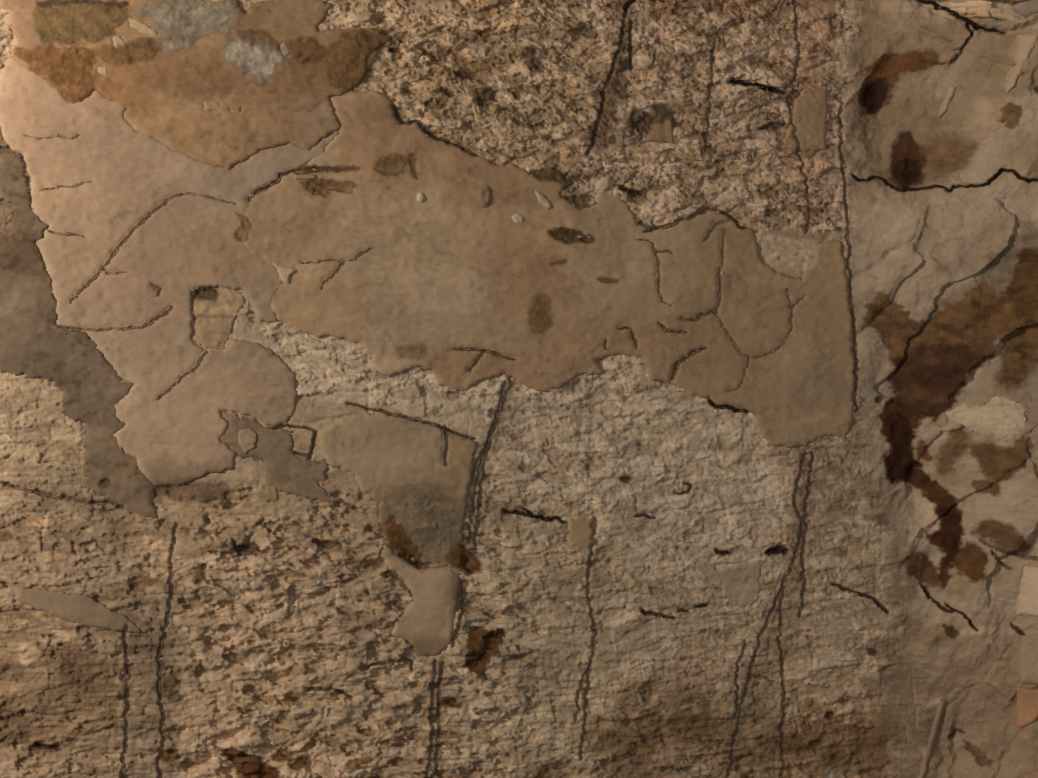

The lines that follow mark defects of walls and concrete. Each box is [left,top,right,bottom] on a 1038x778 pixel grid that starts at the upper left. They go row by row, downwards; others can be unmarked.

peeling [113,35,126,48]
peeling [129,16,158,36]
crack [917,0,1004,65]
crack [585,0,634,155]
corrosion [859,49,937,115]
corrosion [889,132,927,189]
crack [838,97,1038,411]
spalling [192,287,246,350]
peeling [238,428,257,453]
corrosion [880,394,988,588]
corrosion [385,516,422,569]
corrosion [447,543,481,573]